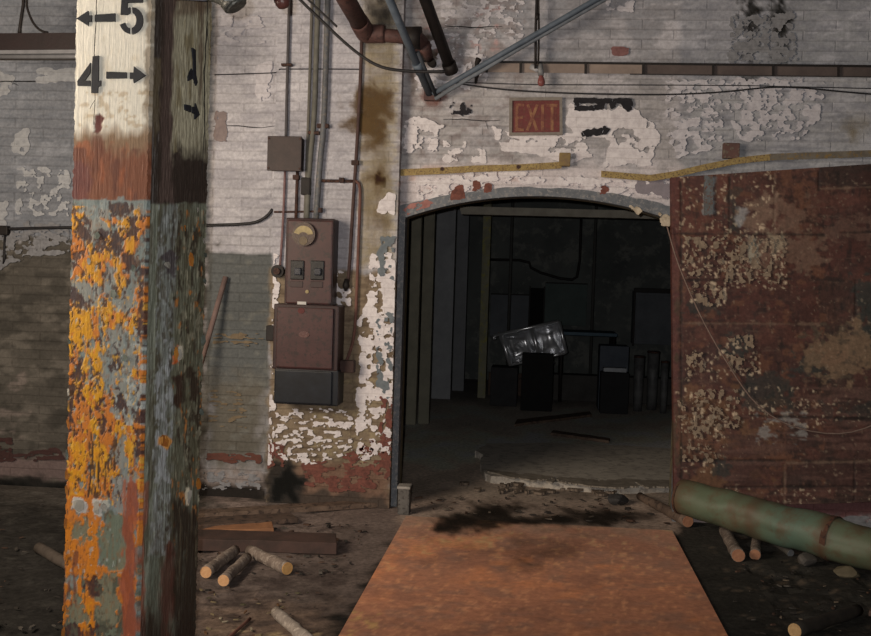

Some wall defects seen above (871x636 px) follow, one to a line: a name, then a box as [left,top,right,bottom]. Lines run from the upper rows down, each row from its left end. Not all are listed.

peeling [429,0,525,90]
spalling [611,46,629,56]
peeling [606,0,635,13]
peeling [726,11,798,64]
damp [744,0,793,47]
peeling [449,102,472,116]
peeling [492,77,825,168]
peeling [377,116,545,215]
peeling [556,175,670,215]
spalling [658,212,670,226]
peeling [187,236,396,504]
damp [434,503,641,533]